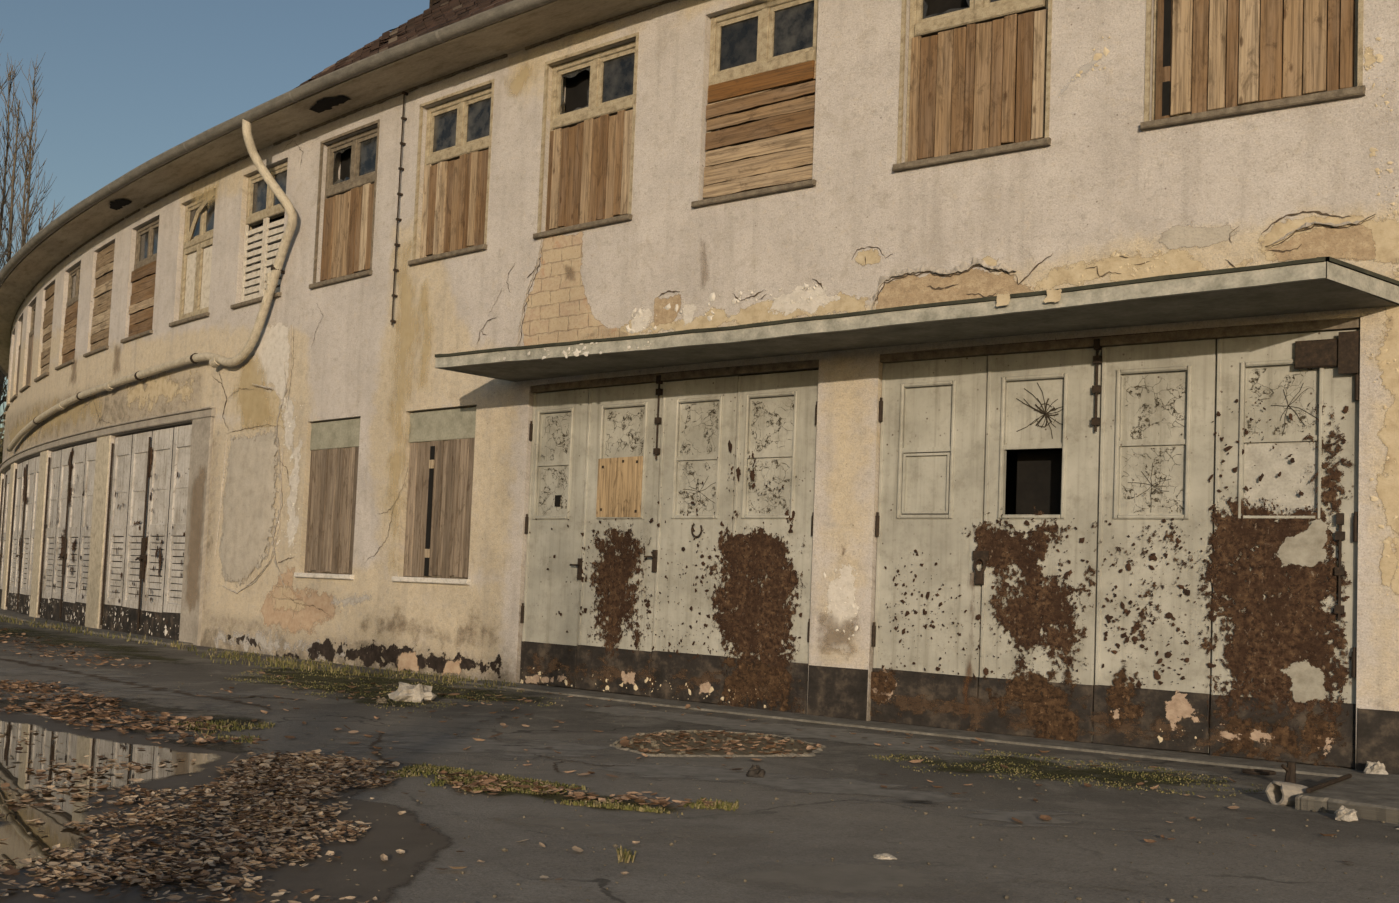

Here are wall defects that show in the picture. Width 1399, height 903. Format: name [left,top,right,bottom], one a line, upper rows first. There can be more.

flaking render [499,147,1399,360]
flaking render [215,322,502,679]
rust [529,440,805,713]
rust [870,399,1357,766]
flaking render [1369,303,1399,604]